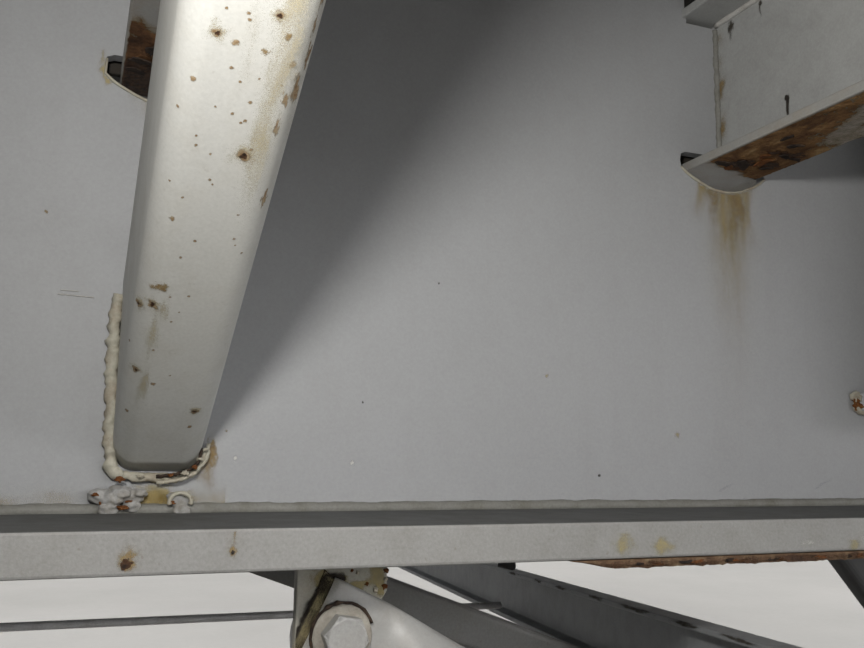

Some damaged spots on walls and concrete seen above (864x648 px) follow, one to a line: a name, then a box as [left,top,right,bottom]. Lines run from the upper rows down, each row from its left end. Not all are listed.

corrosion [208,18,239,45]
corrosion [270,2,292,41]
corrosion [121,19,156,97]
corrosion [281,0,323,107]
corrosion [710,92,864,179]
corrosion [224,144,256,167]
corrosion [136,281,171,314]
corrosion [187,438,226,503]
corrosion [116,486,176,510]
corrosion [116,545,137,572]
corrosion [613,532,864,568]